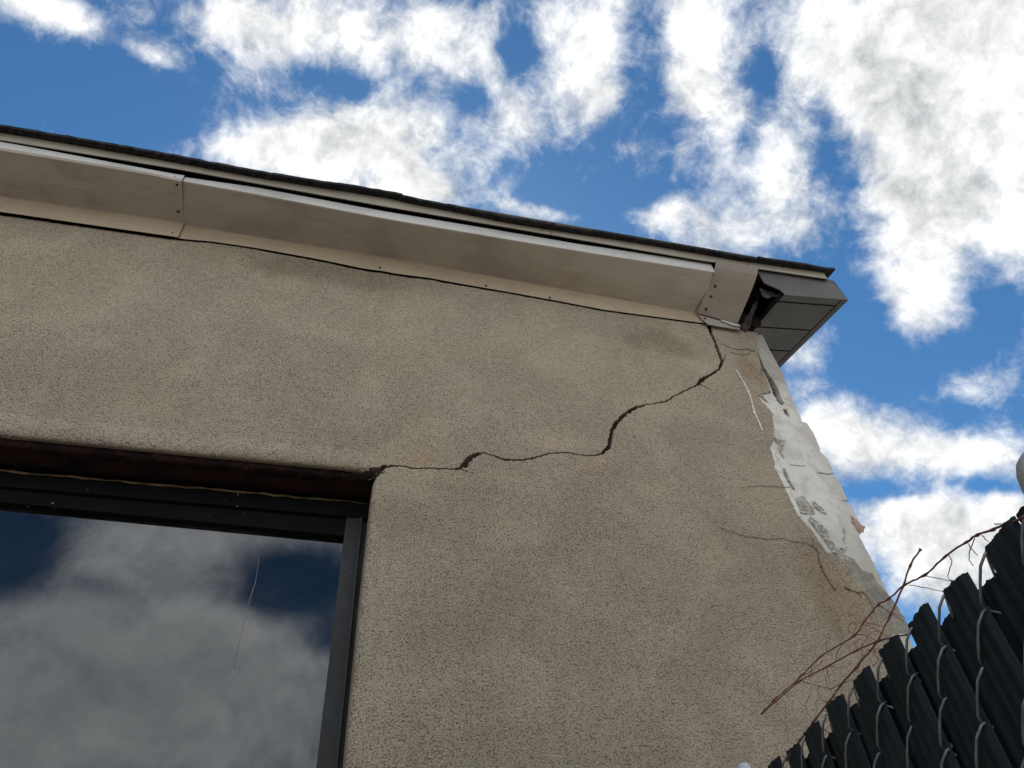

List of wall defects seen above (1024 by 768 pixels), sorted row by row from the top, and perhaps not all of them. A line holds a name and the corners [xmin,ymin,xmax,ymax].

crack [596,324,777,456]
crack [367,466,393,480]
crack [455,453,567,470]
spalling [735,333,913,652]